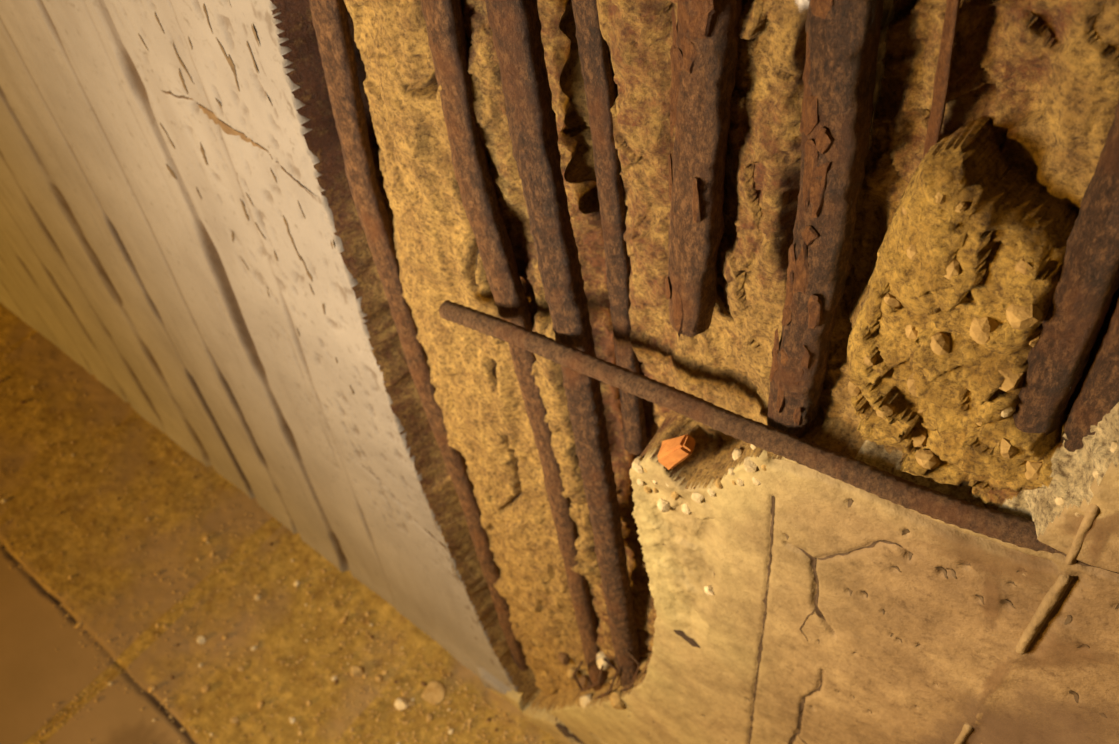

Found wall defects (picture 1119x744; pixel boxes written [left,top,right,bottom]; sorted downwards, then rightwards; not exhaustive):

rust [673,0,715,74]
rust [810,0,833,19]
rust [692,178,701,223]
spalling [801,0,1119,539]
spalling [162,0,808,717]
crack [1053,548,1119,574]
crack [748,496,901,744]